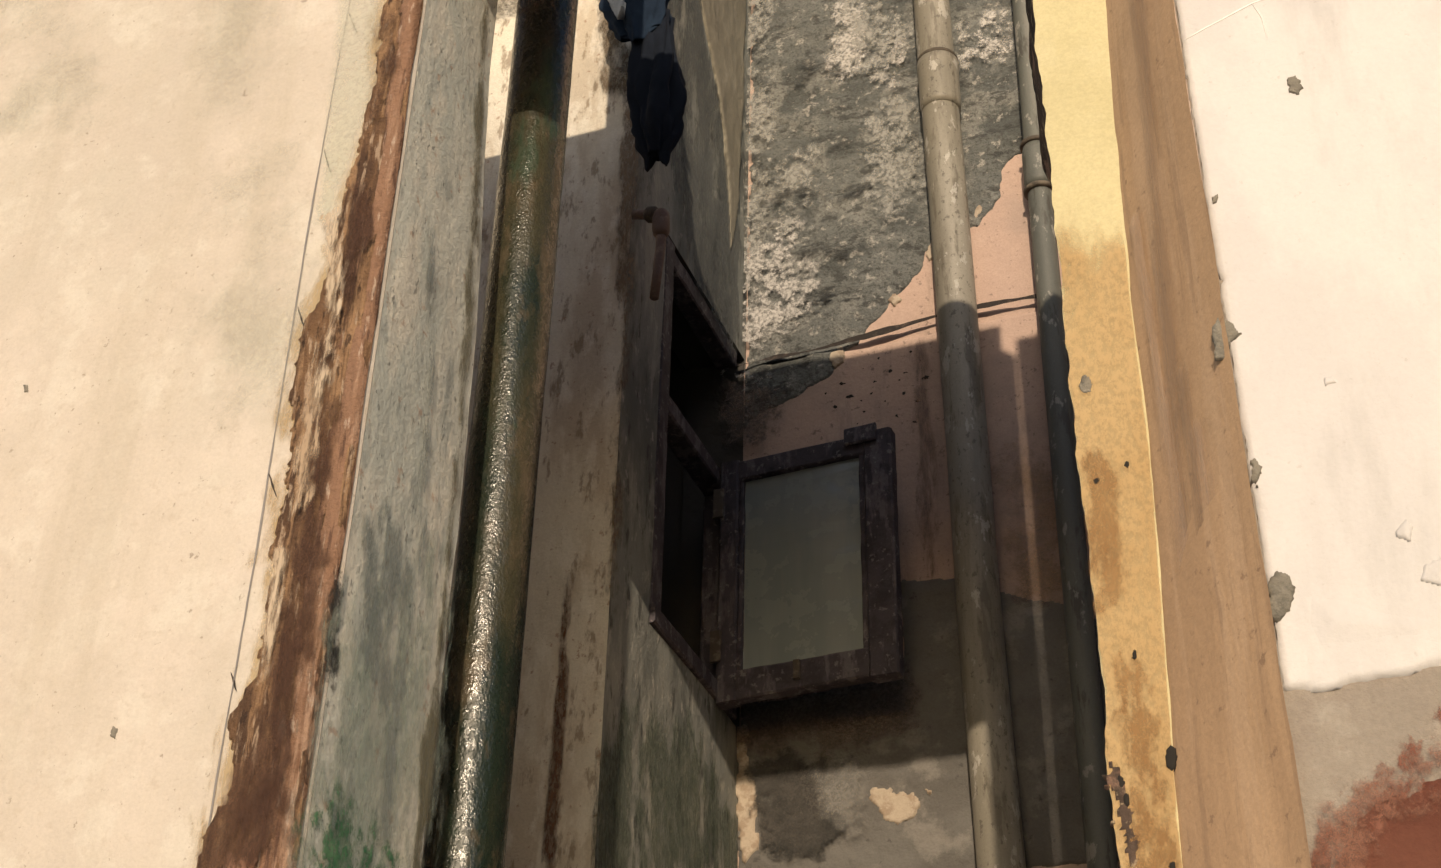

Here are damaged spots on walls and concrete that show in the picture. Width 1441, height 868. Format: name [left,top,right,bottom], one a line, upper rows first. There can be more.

corrosion [292,261,332,361]
corrosion [367,0,387,82]
spalling [699,0,933,429]
spalling [949,0,1023,228]
corrosion [220,740,234,806]
corrosion [542,590,570,866]
spalling [733,578,977,868]
spalling [1000,592,1087,868]
peeling [1311,737,1441,868]